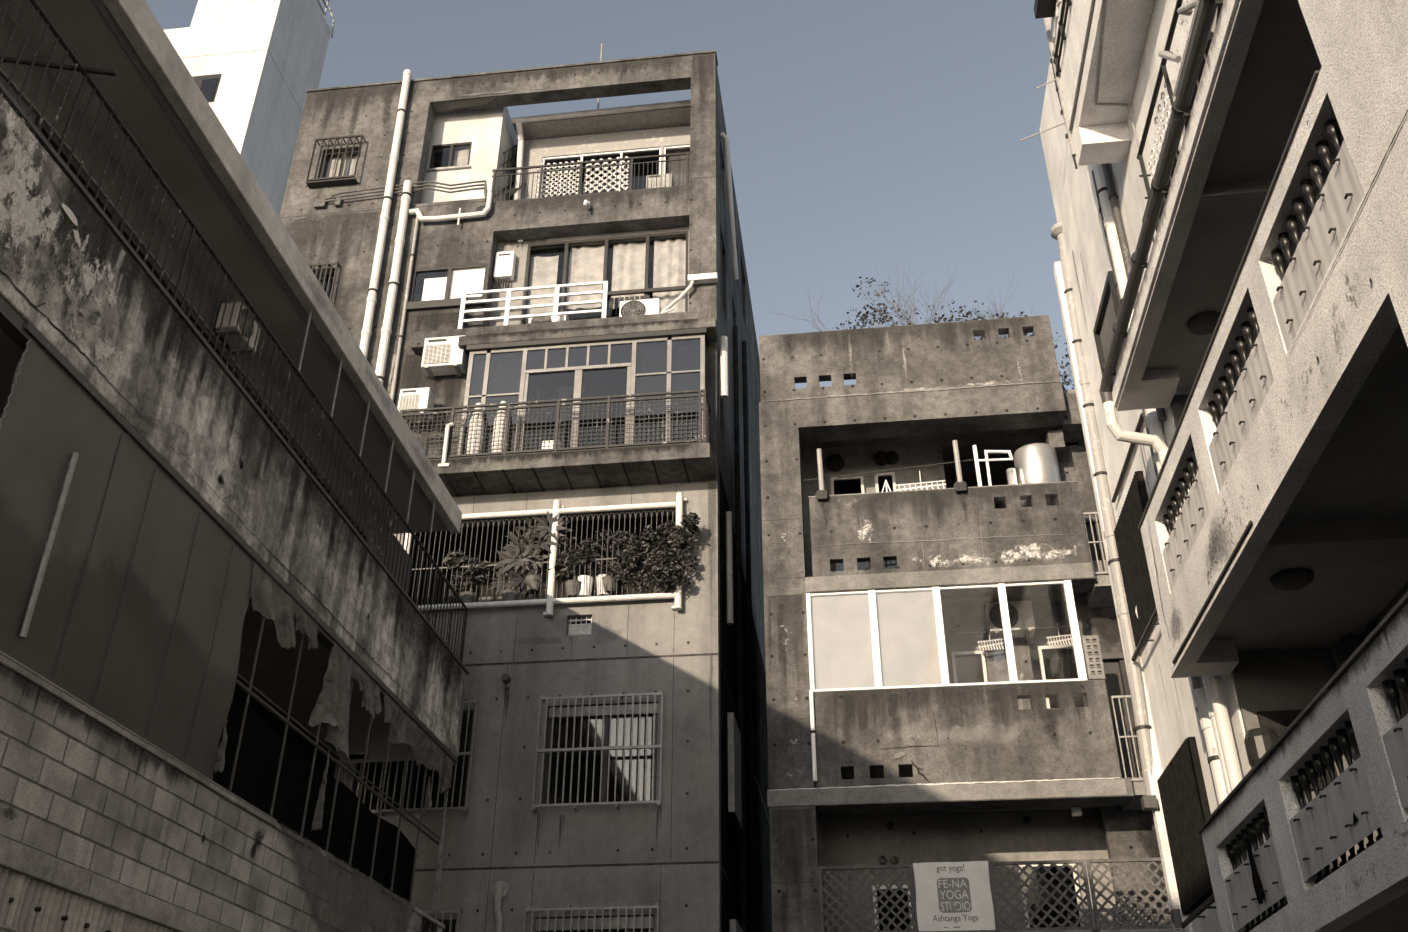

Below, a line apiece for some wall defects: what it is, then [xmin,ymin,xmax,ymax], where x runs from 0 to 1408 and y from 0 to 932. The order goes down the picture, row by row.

damp [0,178,460,693]